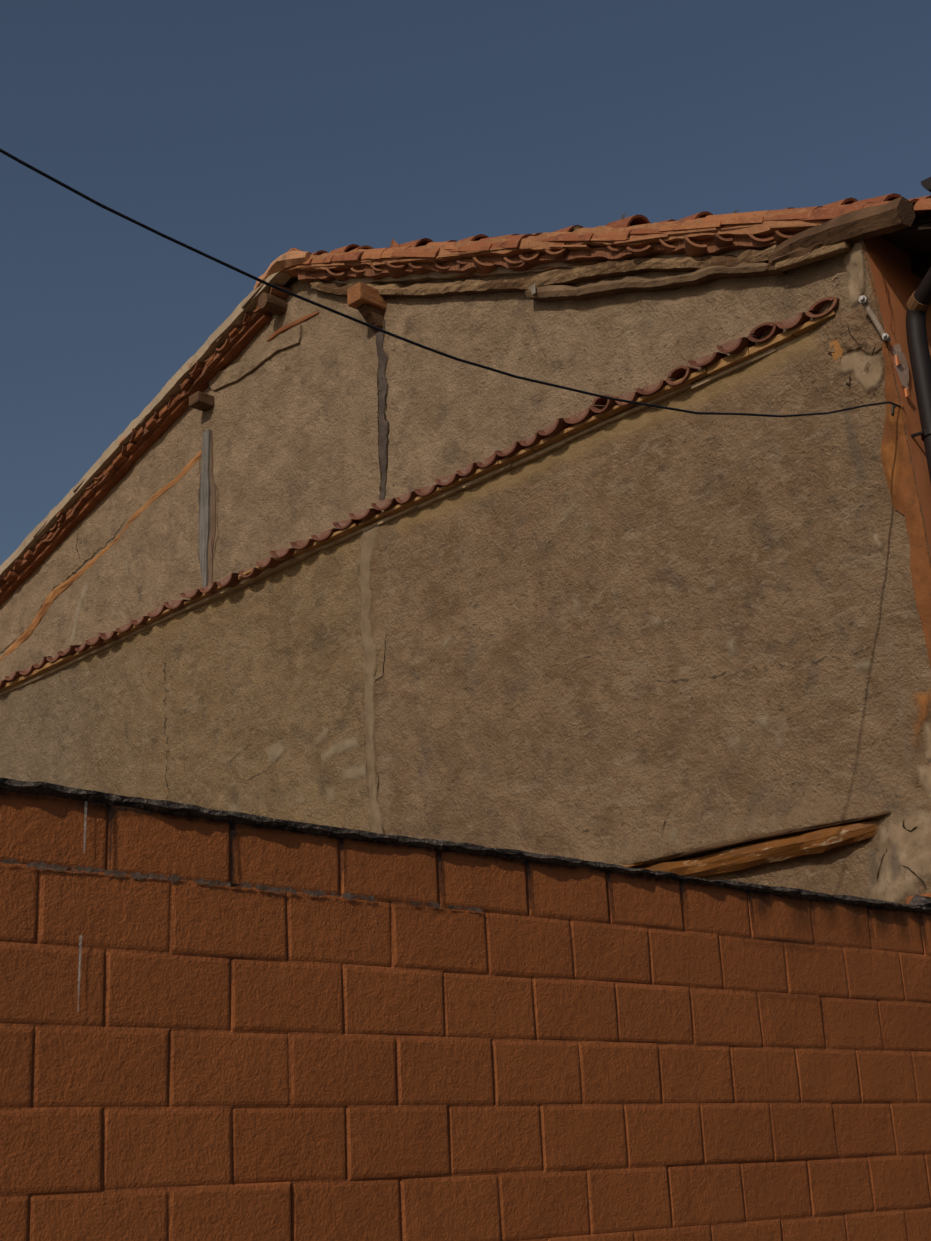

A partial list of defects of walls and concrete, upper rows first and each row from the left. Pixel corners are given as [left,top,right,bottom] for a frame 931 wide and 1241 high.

crack [161,642,169,798]